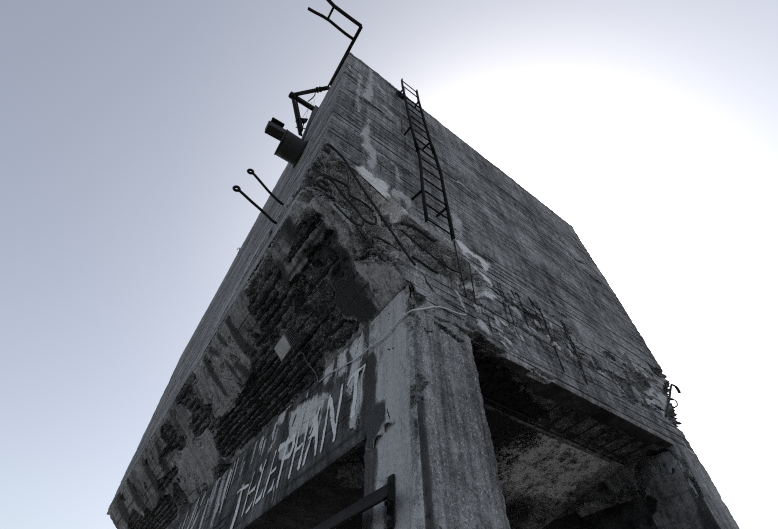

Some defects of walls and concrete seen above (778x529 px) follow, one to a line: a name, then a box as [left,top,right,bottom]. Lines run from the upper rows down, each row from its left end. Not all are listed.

damp [348,65,385,112]
damp [355,119,419,255]
spalling [128,138,684,529]